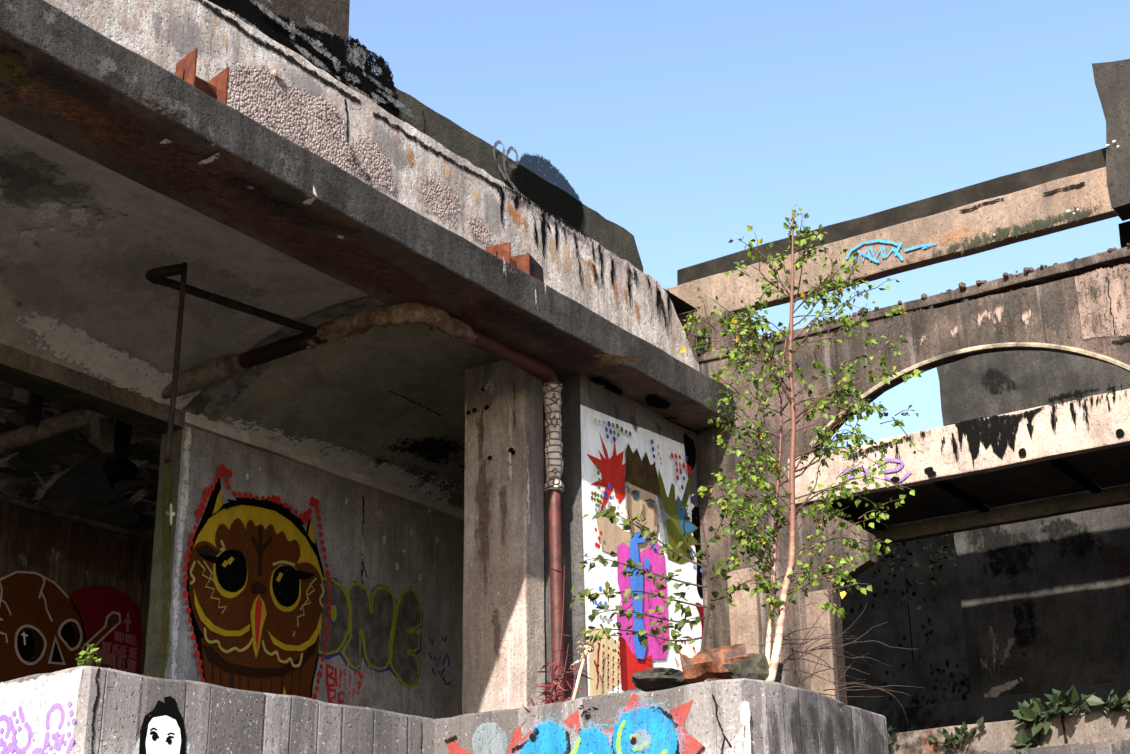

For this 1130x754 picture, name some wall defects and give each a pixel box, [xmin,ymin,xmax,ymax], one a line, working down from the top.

leakage [484,181,671,333]
leakage [374,373,516,595]
leakage [492,608,500,660]
crack [91,668,100,754]
crack [712,694,732,754]
leakage [1112,743,1130,754]